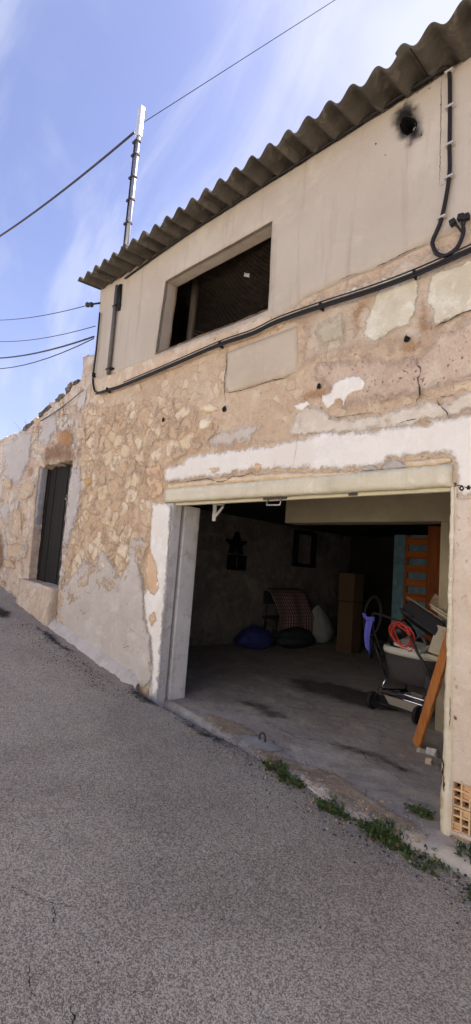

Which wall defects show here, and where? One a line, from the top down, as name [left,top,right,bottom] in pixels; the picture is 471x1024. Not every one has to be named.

spalling [355,261,471,350]
peeling [294,376,365,411]
crack [401,358,454,423]
spalling [58,383,226,603]
spalling [361,459,407,471]